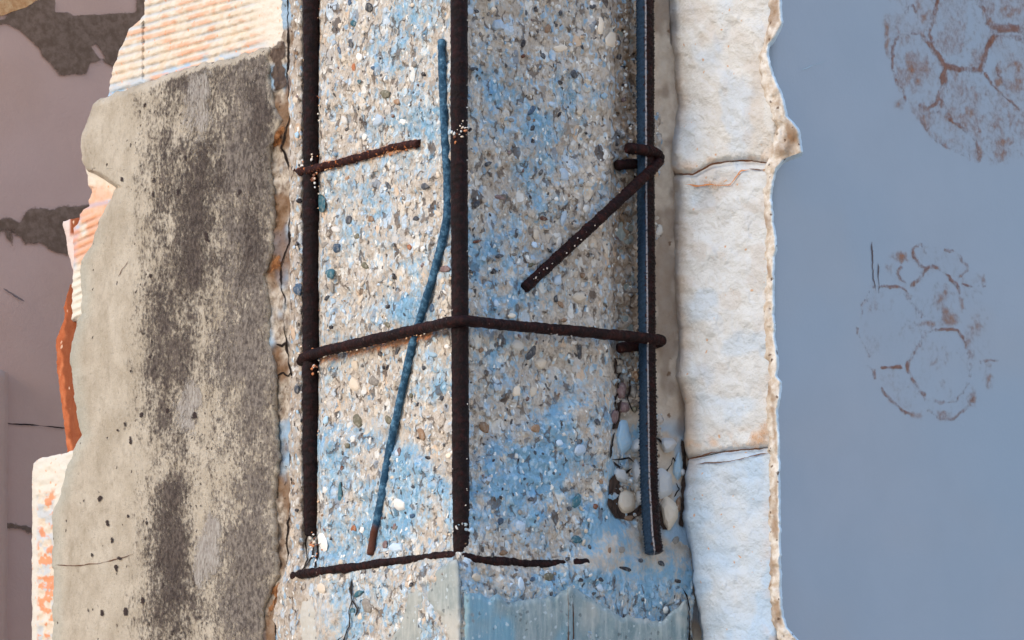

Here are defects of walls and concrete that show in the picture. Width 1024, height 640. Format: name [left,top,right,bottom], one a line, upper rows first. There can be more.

flaking render [0,0,145,76]
crack [280,0,290,170]
crack [677,160,766,187]
damp [128,55,280,640]
crack [276,204,292,377]
spalling [273,0,695,640]
crack [685,448,766,464]